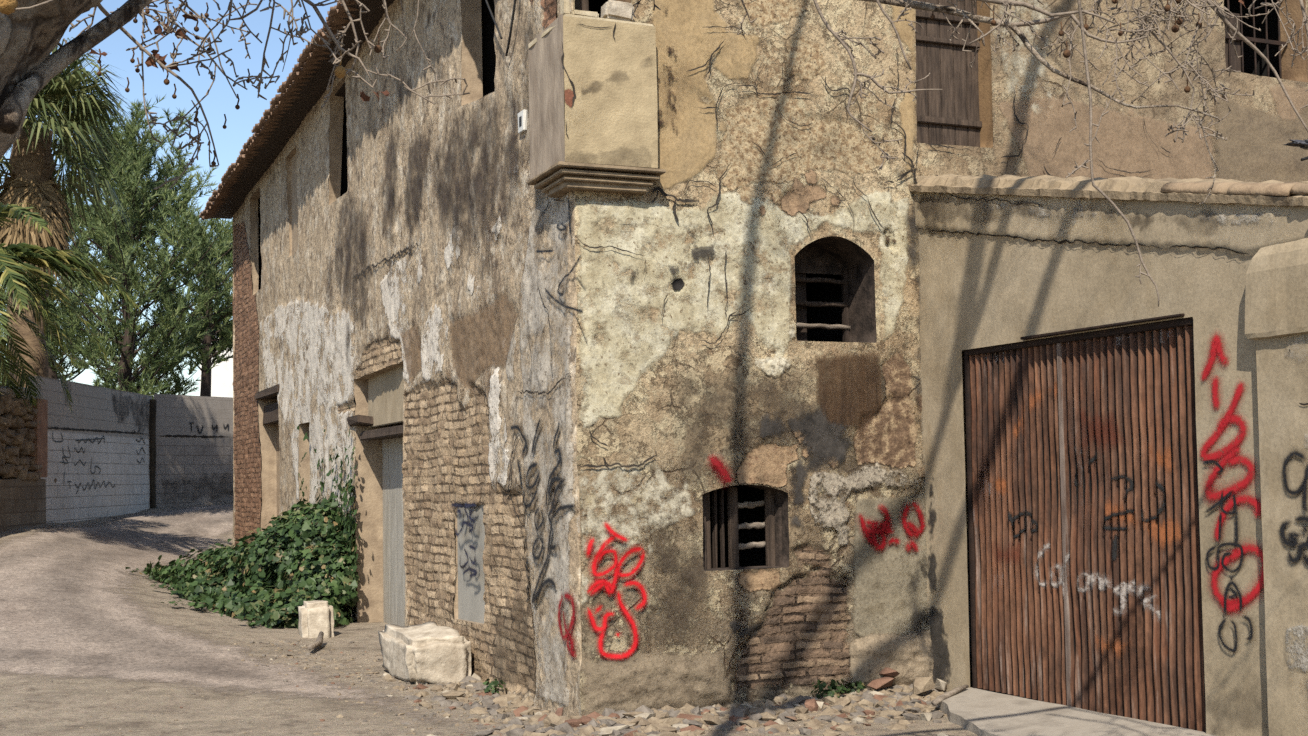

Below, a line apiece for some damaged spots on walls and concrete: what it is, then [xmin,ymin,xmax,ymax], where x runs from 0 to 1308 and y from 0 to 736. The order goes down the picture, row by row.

damp [383,101,530,238]
crack [686,26,850,167]
crack [823,49,1062,231]
crack [1096,116,1170,173]
damp [328,200,370,319]
crack [579,224,668,314]
crack [652,167,752,344]
crack [919,228,1246,254]
flaking render [232,0,929,705]
damp [684,353,886,527]
rust [1105,502,1180,547]